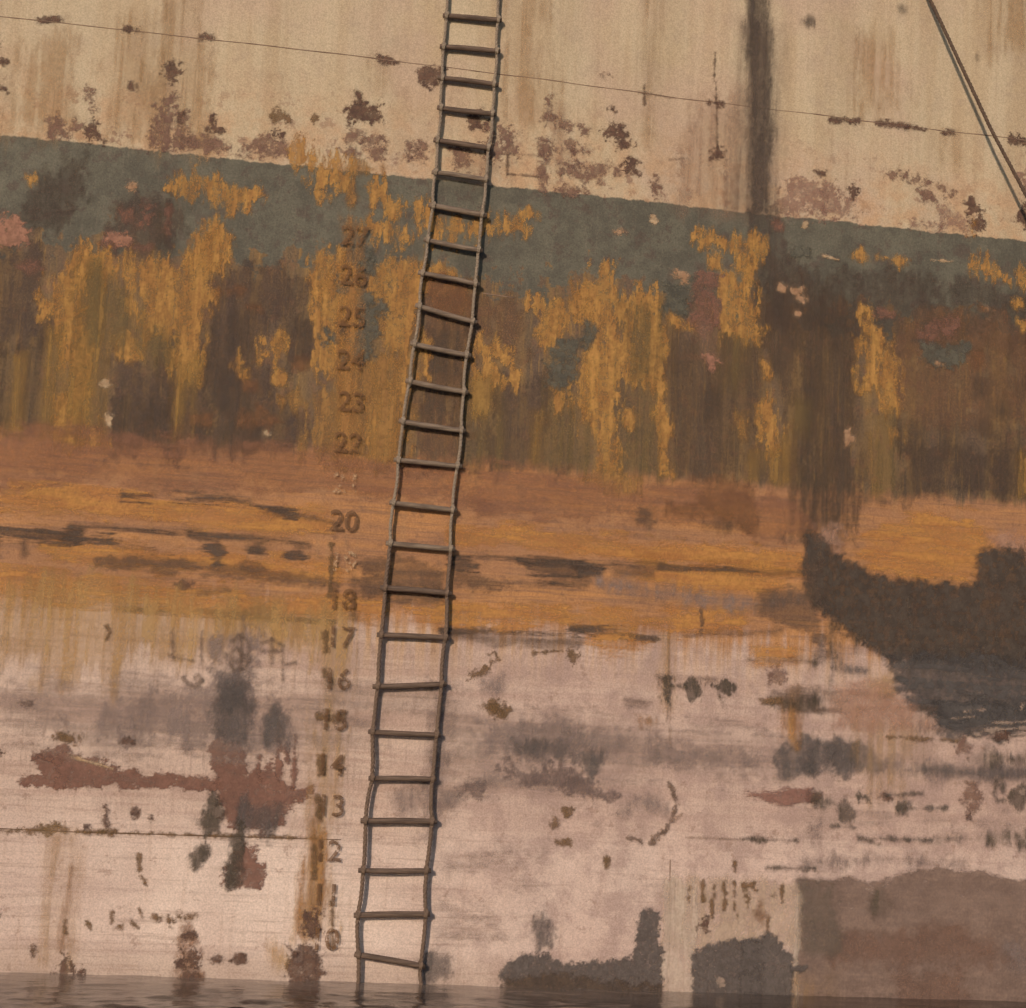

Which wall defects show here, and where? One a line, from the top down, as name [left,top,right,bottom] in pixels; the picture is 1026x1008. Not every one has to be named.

water stain [746,0,778,238]
corrosion [254,505,298,521]
corrosion [0,525,275,590]
corrosion [283,541,308,560]
corrosion [359,520,804,667]
corrosion [218,609,348,685]
corrosion [466,651,512,720]
corrosion [662,675,736,703]
water stain [801,530,1026,779]
corrosion [51,720,80,746]
corrosion [549,806,574,847]
corrosion [284,794,335,982]